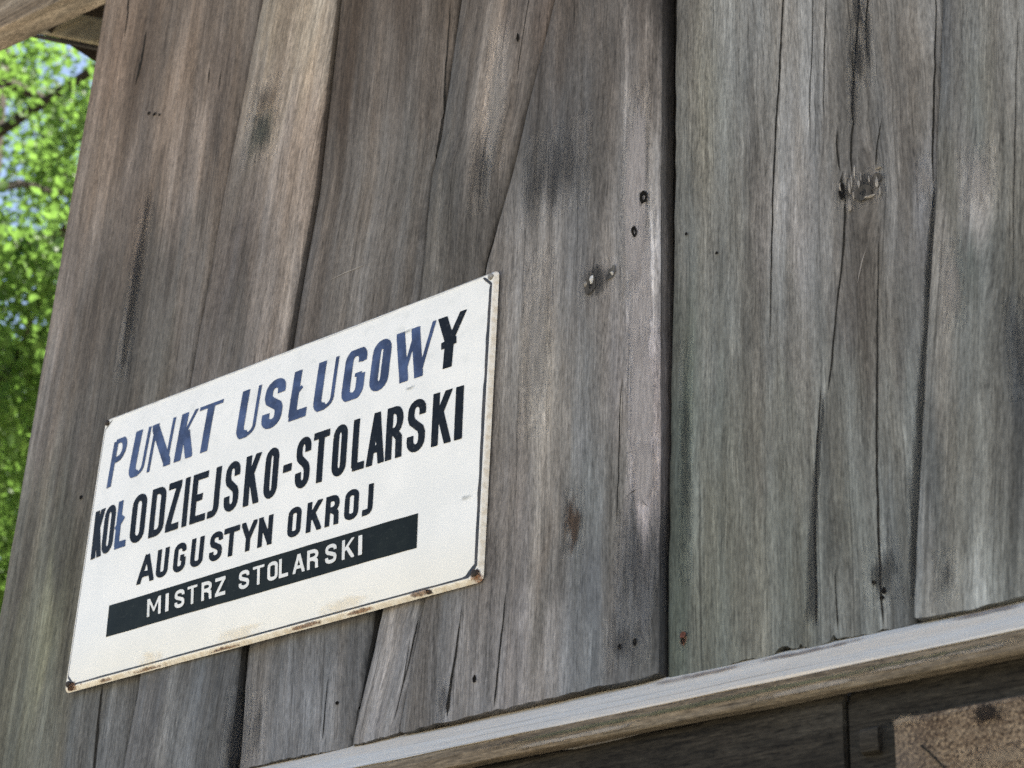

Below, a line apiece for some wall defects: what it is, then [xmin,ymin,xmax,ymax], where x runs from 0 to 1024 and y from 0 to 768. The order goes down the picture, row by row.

crack [769,0,784,341]
crack [808,119,882,630]
crack [875,240,884,624]